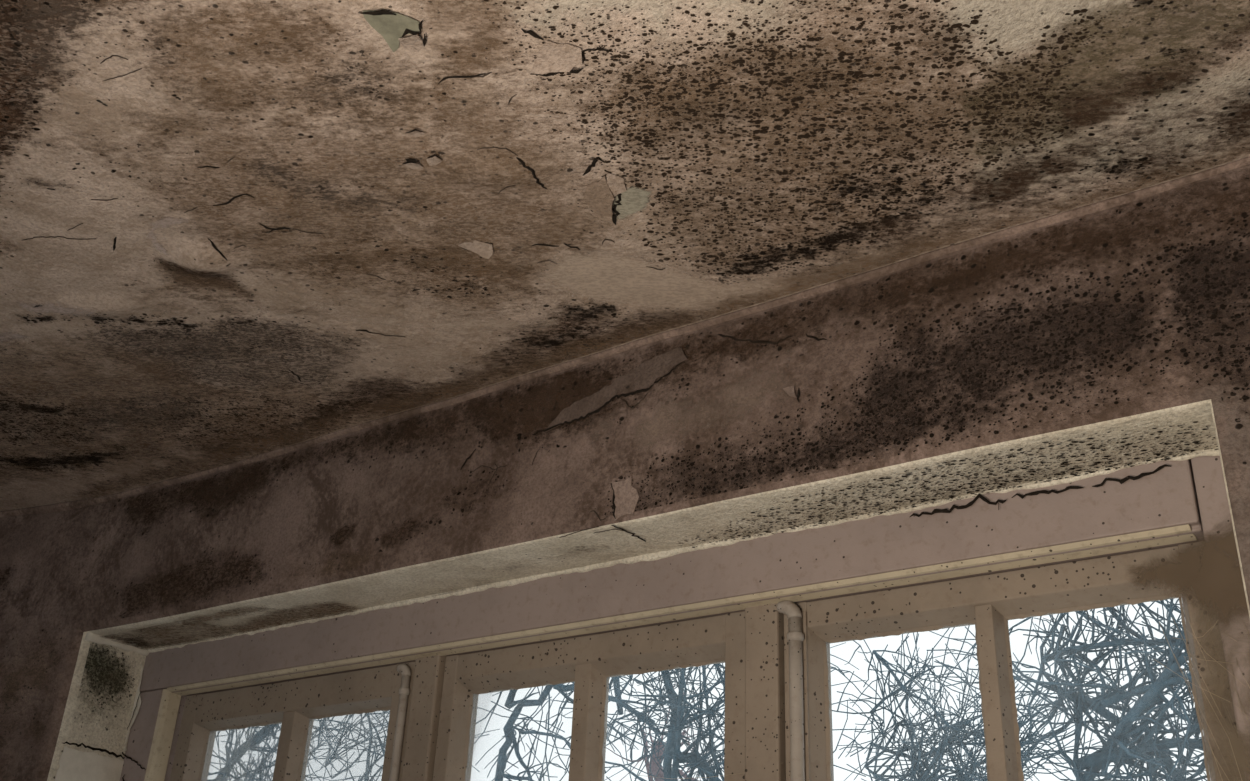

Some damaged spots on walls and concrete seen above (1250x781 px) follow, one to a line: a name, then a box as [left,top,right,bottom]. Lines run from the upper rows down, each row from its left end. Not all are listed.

peeling [360,10,426,52]
peeling [583,157,651,225]
damp [0,0,1250,552]
peeling [532,348,688,435]
peeling [590,476,639,521]
damp [74,546,355,736]
crack [63,741,125,781]